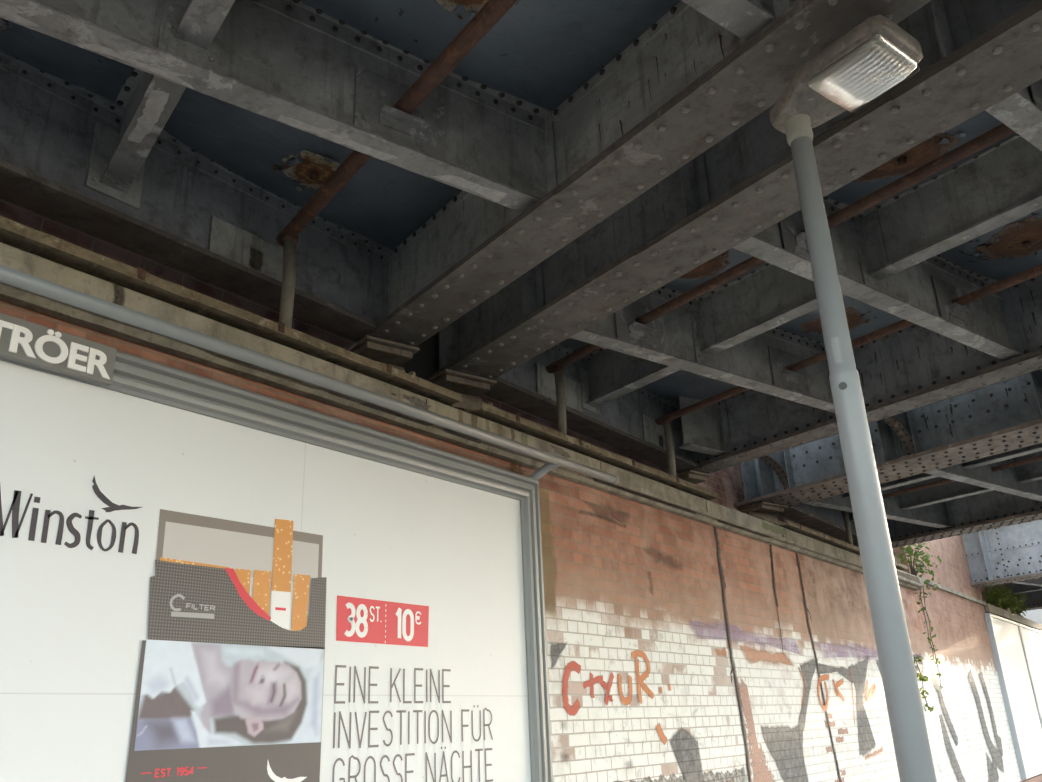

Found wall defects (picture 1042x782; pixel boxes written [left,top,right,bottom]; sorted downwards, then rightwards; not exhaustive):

peeling [0,8,39,26]
peeling [76,43,194,89]
corrosion [271,150,340,191]
corrosion [972,216,1042,260]
crack [713,526,752,782]
crack [770,545,842,782]